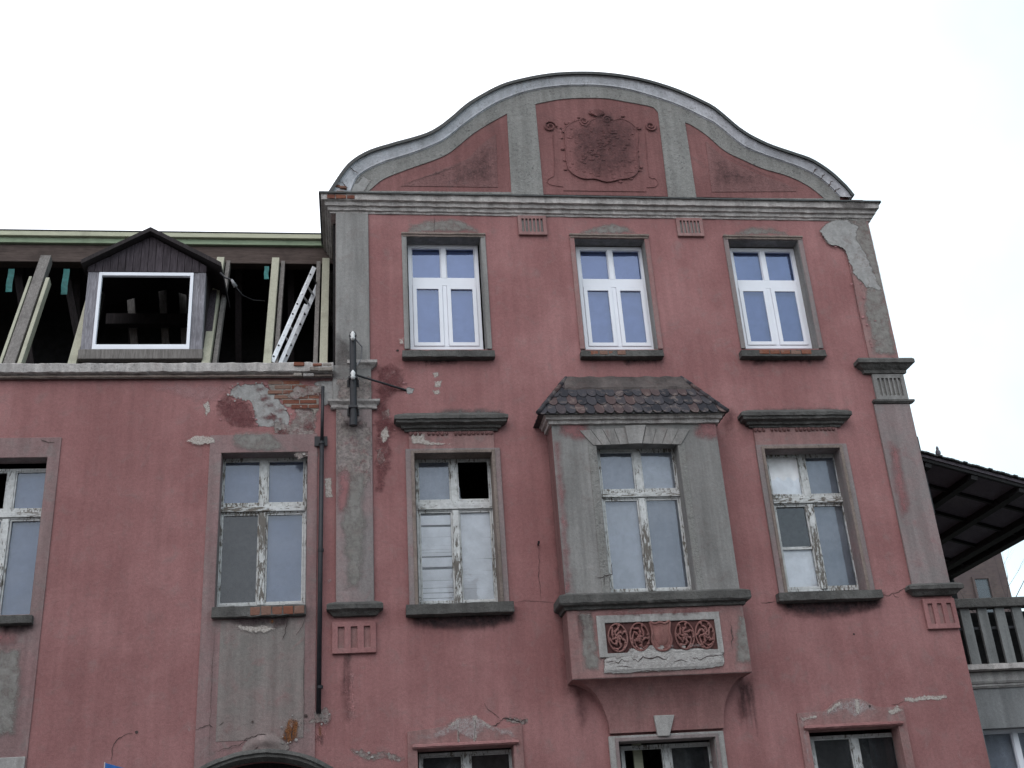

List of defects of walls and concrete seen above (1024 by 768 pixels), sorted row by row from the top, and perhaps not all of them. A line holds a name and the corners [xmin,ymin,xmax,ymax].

flaking render [820,218,895,357]
peeling [188,436,215,444]
flaking render [203,367,407,497]
crack [456,703,526,741]